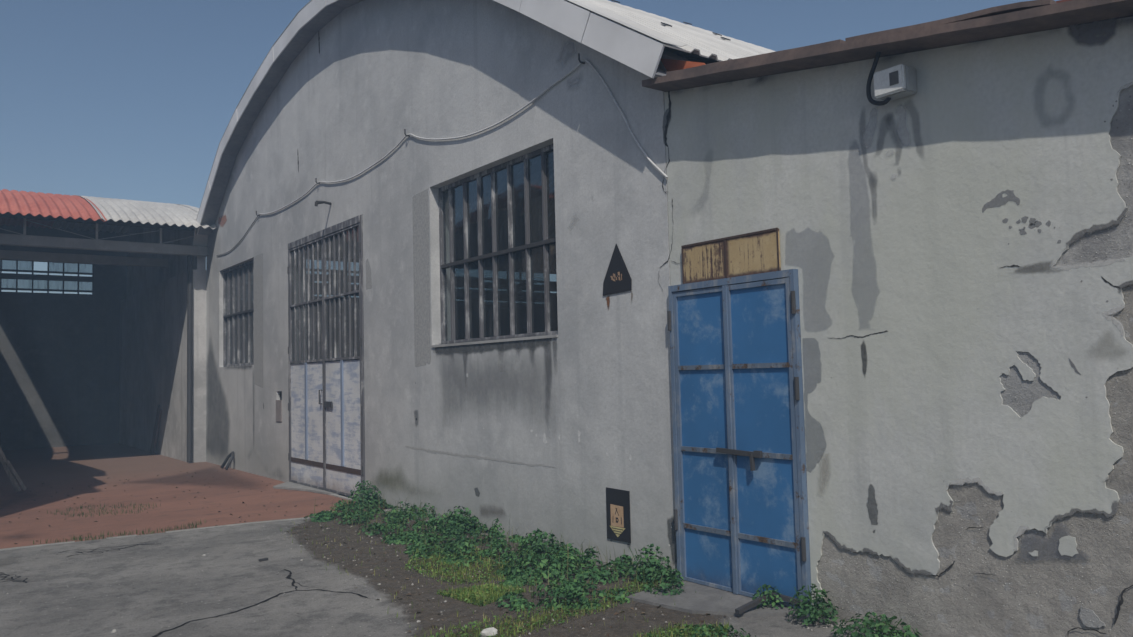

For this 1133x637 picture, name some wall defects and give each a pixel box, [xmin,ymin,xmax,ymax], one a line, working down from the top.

damp [1069,18,1133,45]
flaking render [982,82,1133,344]
damp [435,334,550,355]
flaking render [1000,351,1061,417]
flaking render [817,368,1133,637]
crack [152,589,368,637]